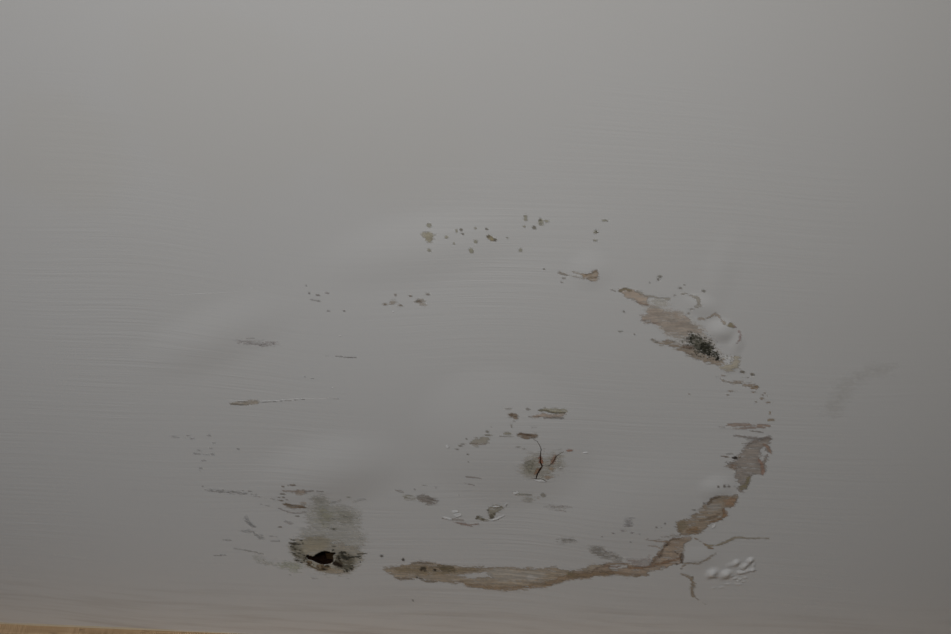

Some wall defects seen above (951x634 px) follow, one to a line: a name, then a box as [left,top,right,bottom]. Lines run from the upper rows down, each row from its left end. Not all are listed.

leakage [613,288,770,403]
crack [533,440,588,482]
leakage [290,510,365,573]
peeling [442,504,507,526]
leakage [385,419,773,597]